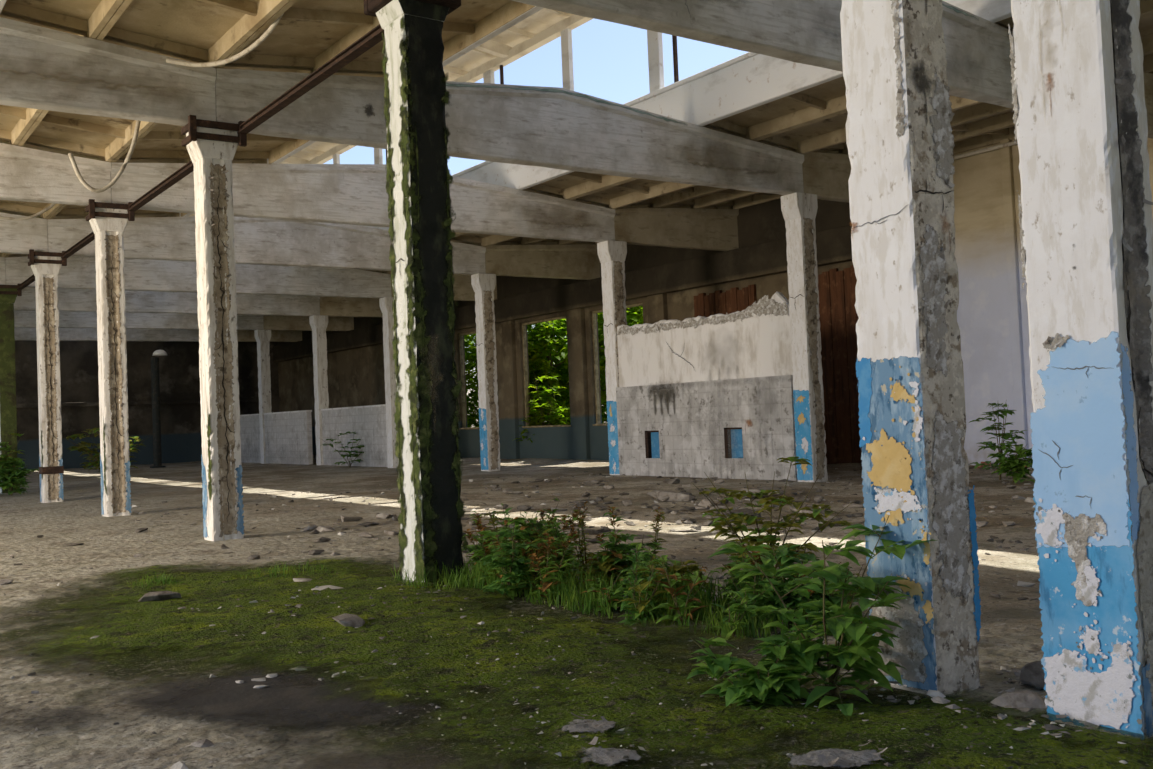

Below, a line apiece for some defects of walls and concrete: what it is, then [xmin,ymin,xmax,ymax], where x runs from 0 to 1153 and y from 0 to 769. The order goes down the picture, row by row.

damp [650,384,675,415]
spalling [613,261,789,378]
spalling [796,217,825,480]
spalling [919,224,951,377]
spalling [1036,0,1153,739]
peeling [862,365,934,683]
peeling [968,485,981,641]